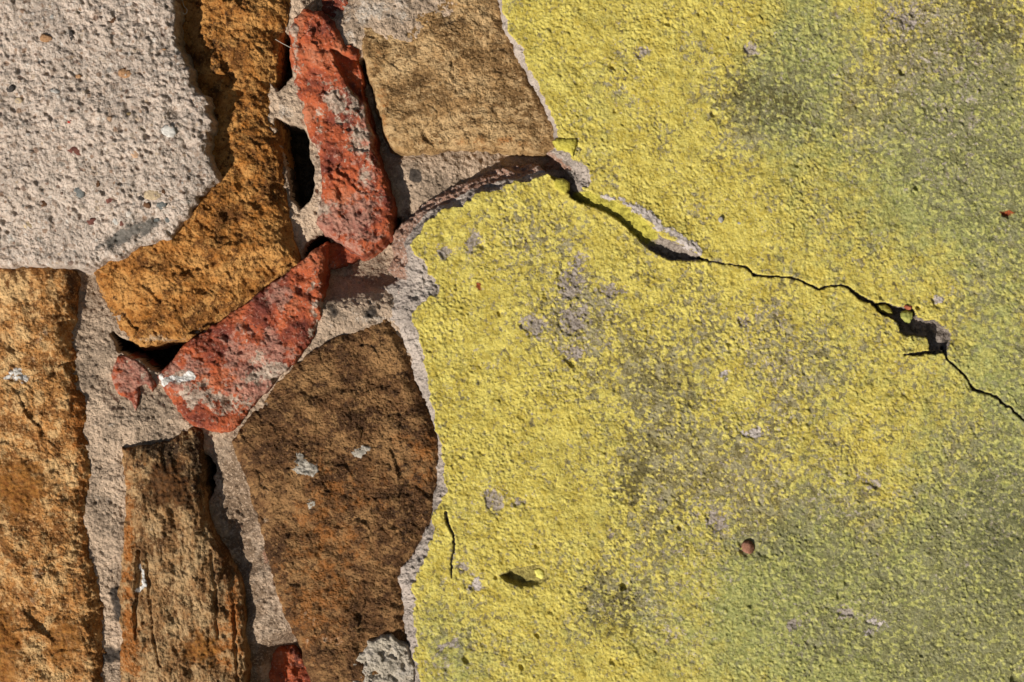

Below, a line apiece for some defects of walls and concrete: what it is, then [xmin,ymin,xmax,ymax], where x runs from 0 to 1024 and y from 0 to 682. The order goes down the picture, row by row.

crack [559,166,875,306]
flaking render [385,0,591,682]
crack [904,349,1024,421]
crack [444,511,456,578]